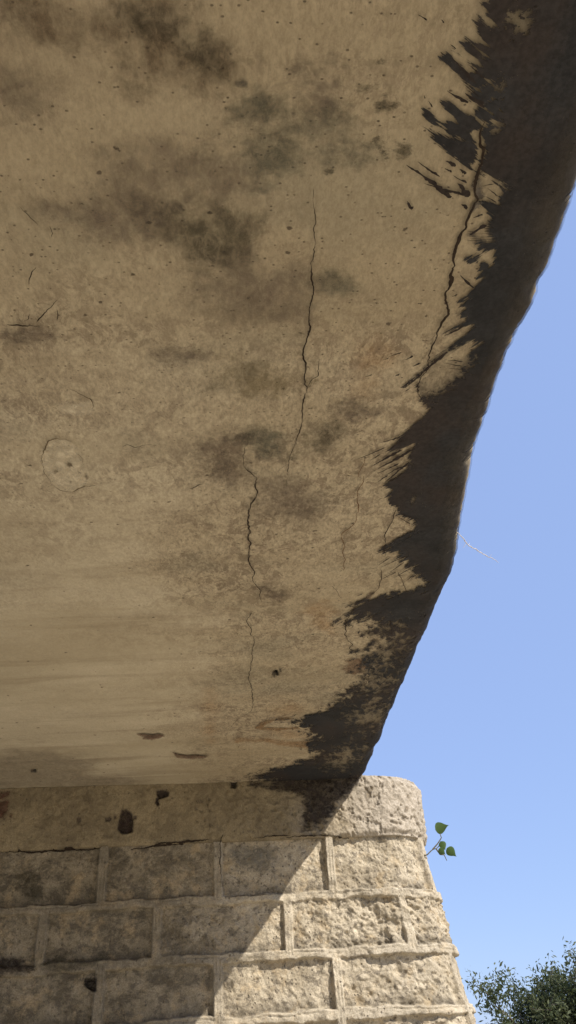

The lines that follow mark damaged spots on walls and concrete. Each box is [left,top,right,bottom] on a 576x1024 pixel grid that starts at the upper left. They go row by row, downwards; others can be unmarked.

water stain [176,207,246,262]
crack [417,120,486,400]
crack [215,190,319,747]
water stain [246,0,576,829]
crack [6,846,98,854]
crack [131,835,272,897]